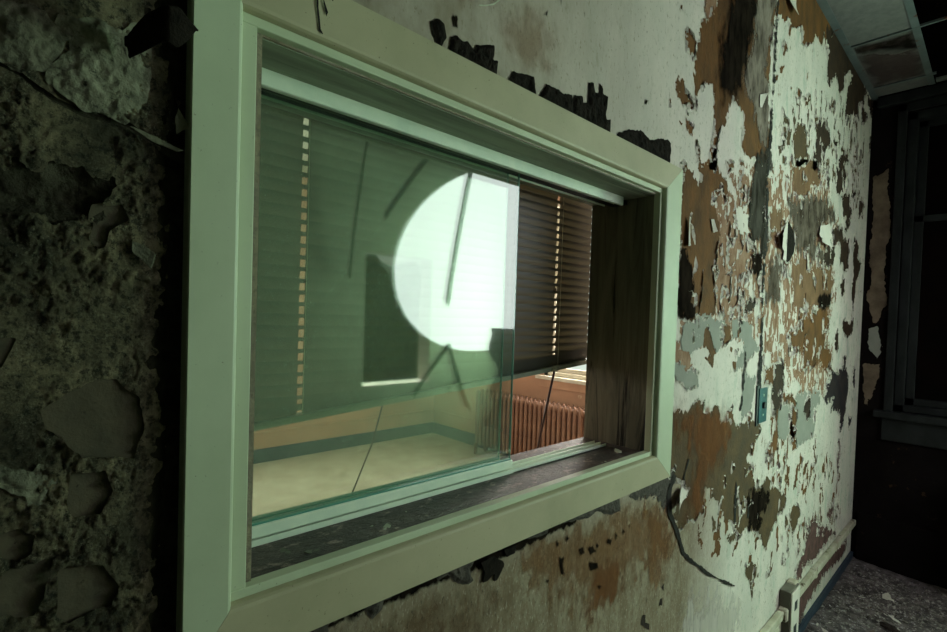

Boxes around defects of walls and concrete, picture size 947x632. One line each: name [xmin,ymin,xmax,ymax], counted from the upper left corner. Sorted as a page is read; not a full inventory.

peeling [430,19,498,74]
crack [0,62,185,164]
spalling [0,157,129,249]
spalling [124,0,198,632]
peeling [508,0,873,626]
damp [328,609,365,628]
damp [383,575,450,605]
peeling [437,529,548,585]
damp [470,502,676,609]
crack [667,459,735,586]
crack [734,480,749,531]
damp [748,486,770,532]